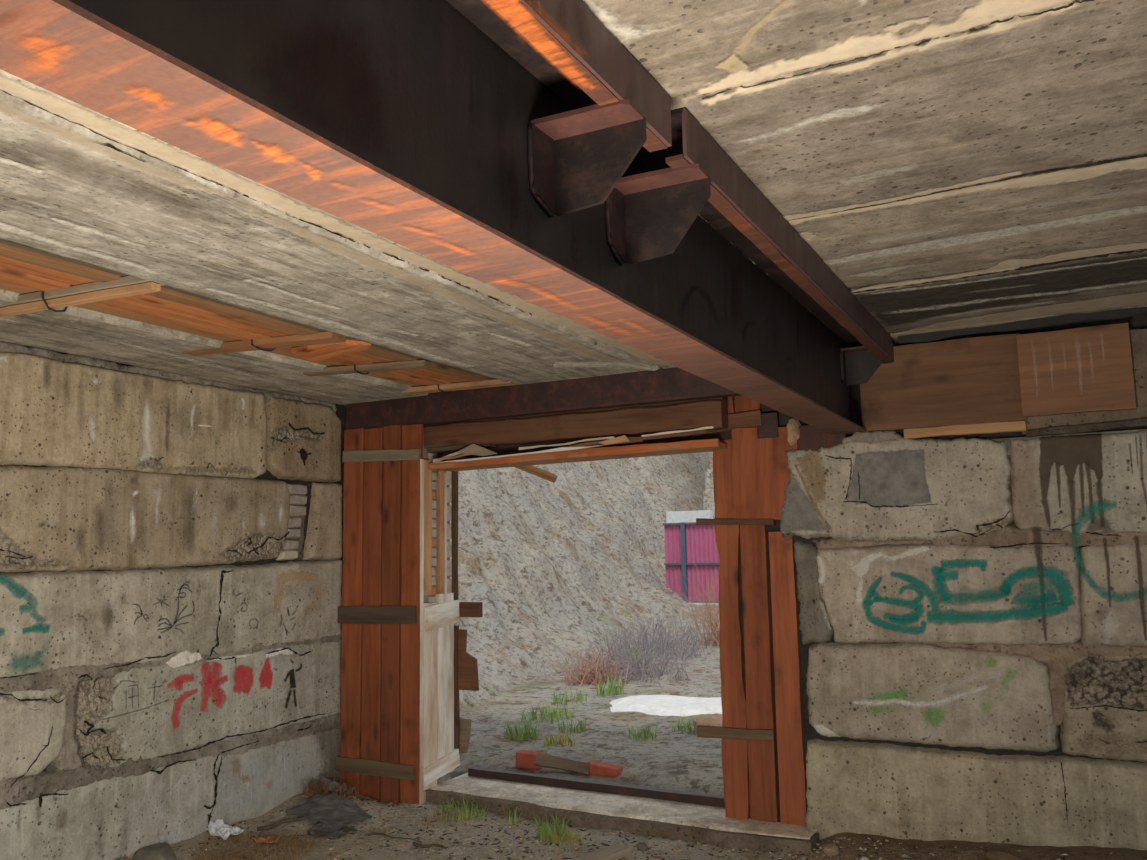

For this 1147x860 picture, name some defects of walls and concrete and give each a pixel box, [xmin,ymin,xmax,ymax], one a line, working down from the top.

corrosion [487,0,593,88]
flaking render [684,0,1077,105]
corrosion [202,122,240,144]
crack [207,570,236,663]
spalling [221,532,290,562]
leakage [1033,433,1111,640]
leakage [1135,536,1147,640]
crack [7,726,68,808]
spalling [0,675,126,769]
crack [78,652,175,680]
crack [150,713,325,831]
spalling [1065,652,1147,731]